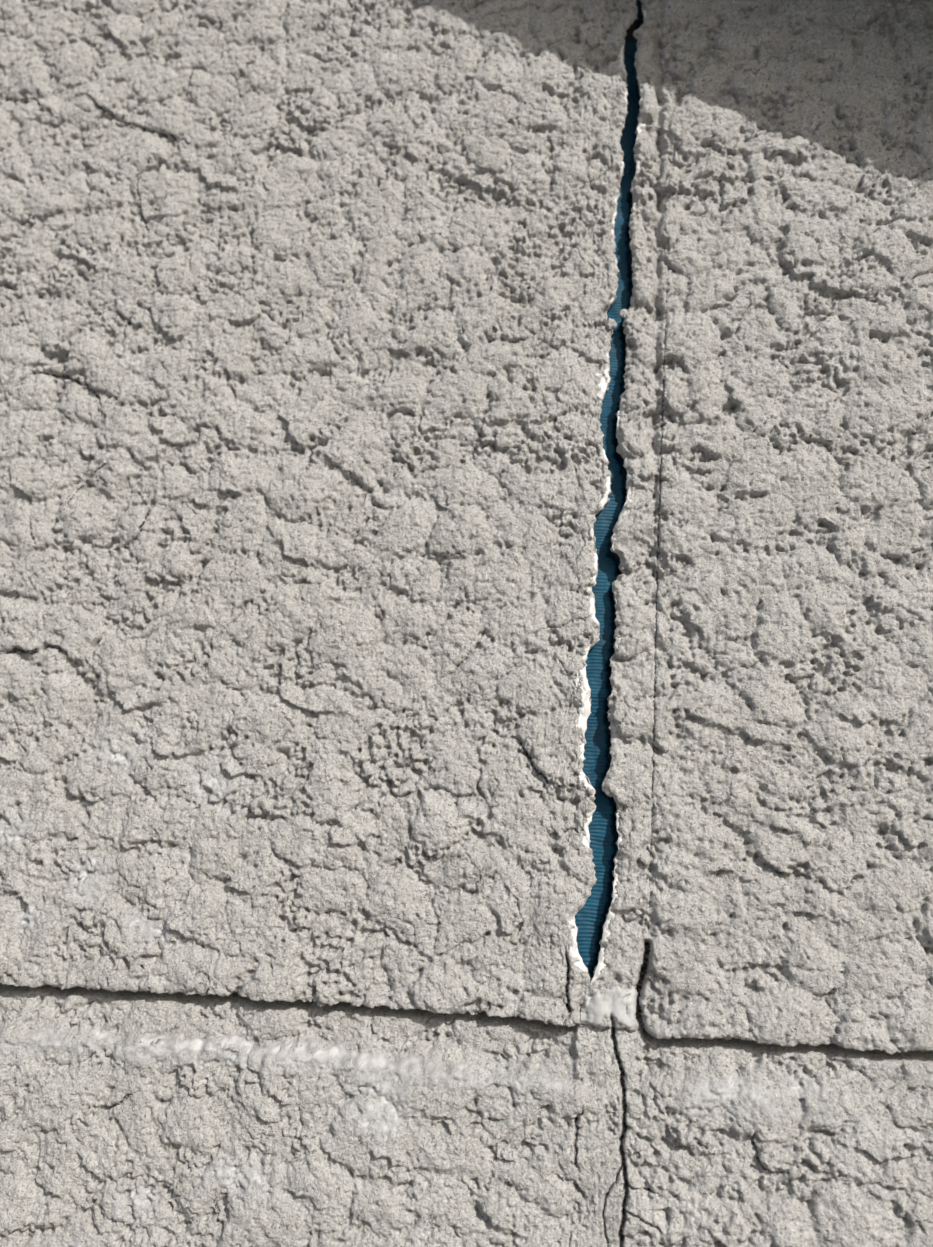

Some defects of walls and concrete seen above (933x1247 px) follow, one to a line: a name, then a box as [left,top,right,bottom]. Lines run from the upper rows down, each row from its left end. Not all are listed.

crack [515,0,669,1247]